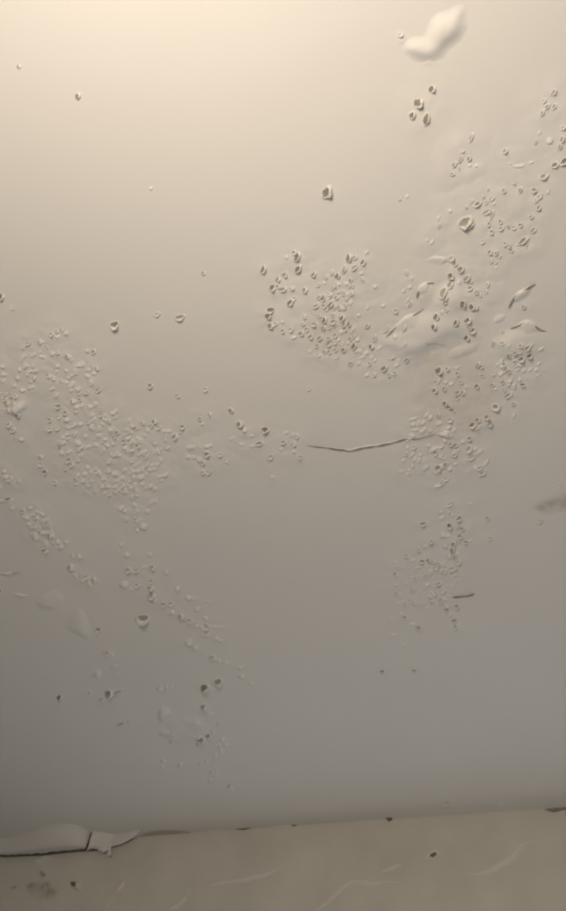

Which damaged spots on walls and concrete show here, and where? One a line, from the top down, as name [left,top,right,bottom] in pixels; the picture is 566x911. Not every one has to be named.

crack [307,434,436,452]
peeling [0,823,191,864]